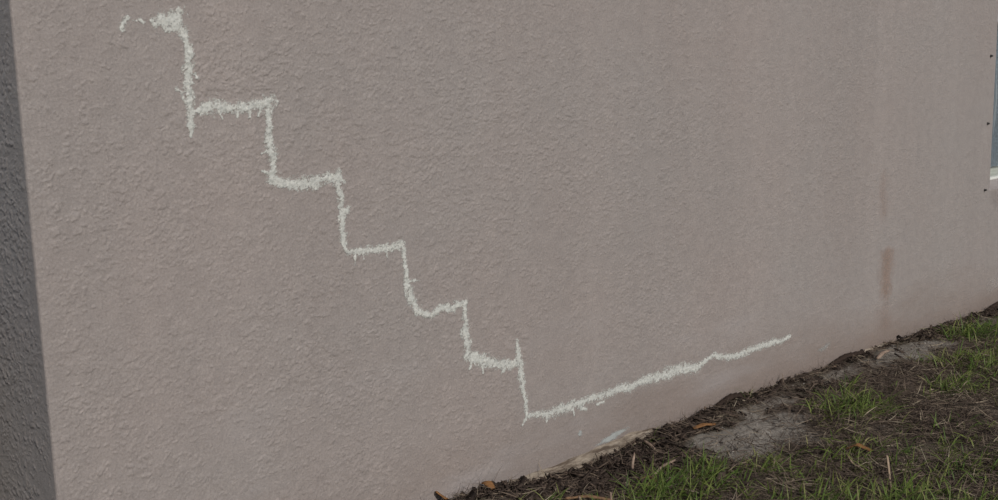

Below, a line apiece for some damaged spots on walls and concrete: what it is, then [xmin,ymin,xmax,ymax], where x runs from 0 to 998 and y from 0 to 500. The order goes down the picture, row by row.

crack [120,6,791,426]